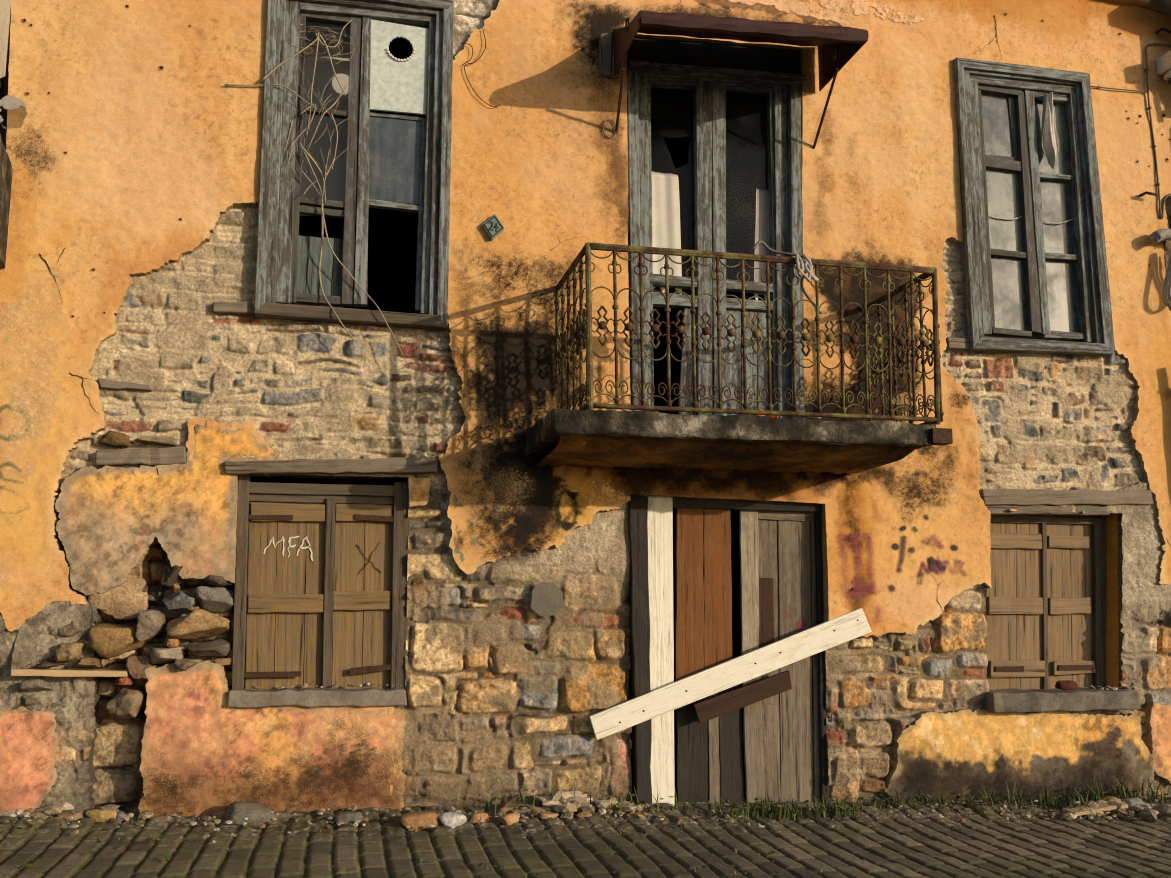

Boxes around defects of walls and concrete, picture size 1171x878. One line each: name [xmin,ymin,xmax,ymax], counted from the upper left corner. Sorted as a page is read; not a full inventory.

spalling [452,0,499,60]
leakage [568,1,824,237]
spalling [59,205,632,810]
leakage [452,255,586,562]
leakage [611,445,959,523]
leakage [797,242,926,422]
spalling [941,239,1171,745]
spalling [1154,198,1171,287]
spalling [0,543,235,814]
spalling [824,584,989,804]
leakage [890,736,1133,805]
spalling [1137,775,1171,799]